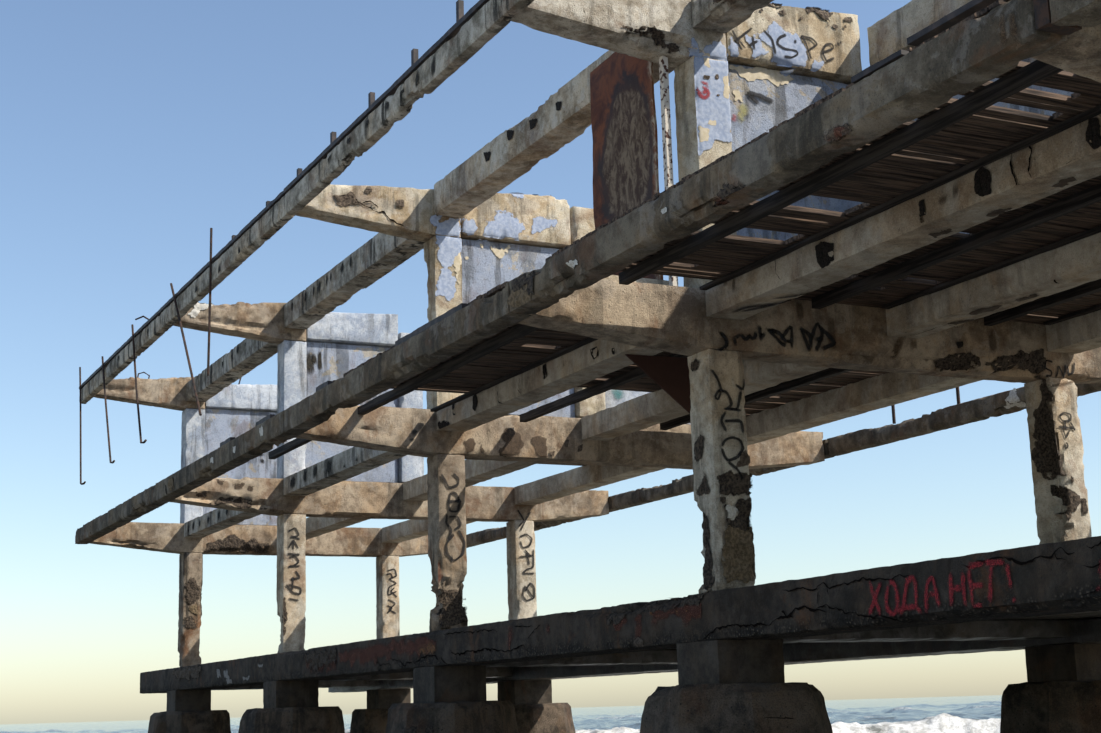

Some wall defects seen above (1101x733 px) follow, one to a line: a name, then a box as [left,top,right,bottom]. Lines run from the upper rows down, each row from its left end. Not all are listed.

spalling [799,7,853,29]
peeling [622,2,824,155]
crack [333,195,407,228]
peeling [430,210,558,301]
spalling [507,271,541,308]
spalling [694,435,704,462]
spalling [935,349,1088,521]
spalling [606,450,756,625]
crack [963,542,1101,595]
spalling [437,588,467,629]
crack [702,574,909,640]